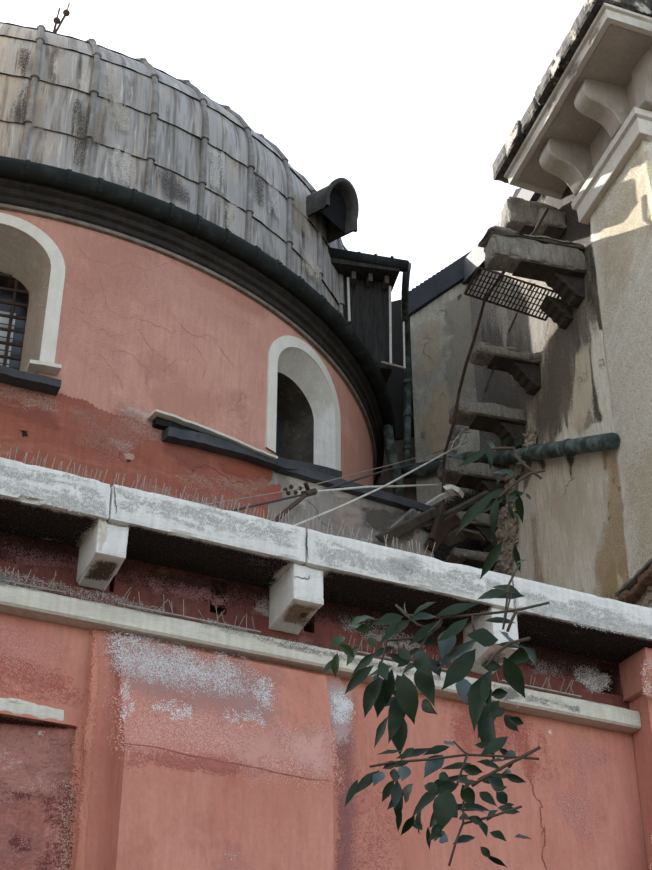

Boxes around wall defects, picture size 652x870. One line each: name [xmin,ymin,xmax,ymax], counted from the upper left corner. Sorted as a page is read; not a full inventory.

damp [69,63,136,185]
damp [439,186,603,445]
damp [0,383,299,550]
damp [314,521,502,600]
flaking render [492,464,523,577]
flaking render [522,430,537,448]
damp [517,449,652,641]
flaking render [634,586,652,608]
damp [98,627,291,727]
damp [327,676,401,870]
damp [443,685,580,786]
crack [530,779,547,869]